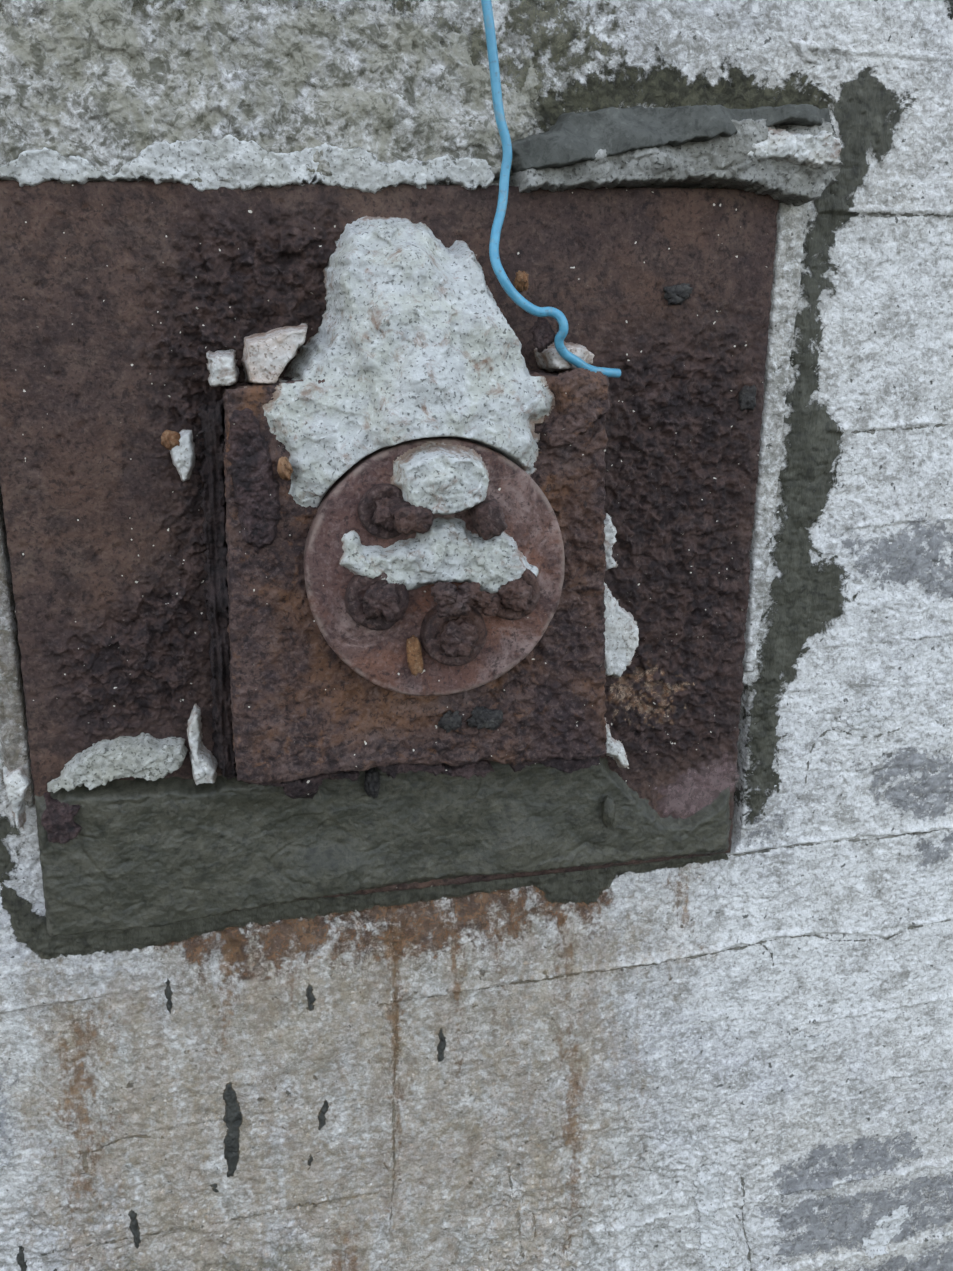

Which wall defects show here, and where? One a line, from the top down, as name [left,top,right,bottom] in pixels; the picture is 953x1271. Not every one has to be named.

spalling [0,118,844,206]
corrosion [513,271,529,292]
corrosion [529,317,556,353]
corrosion [161,430,181,450]
spalling [262,216,555,593]
corrosion [197,398,251,784]
corrosion [608,662,695,728]
corrosion [269,771,360,799]
corrosion [154,880,613,1069]
corrosion [56,1015,104,1150]
crack [41,920,951,1256]
crack [740,1177,752,1271]